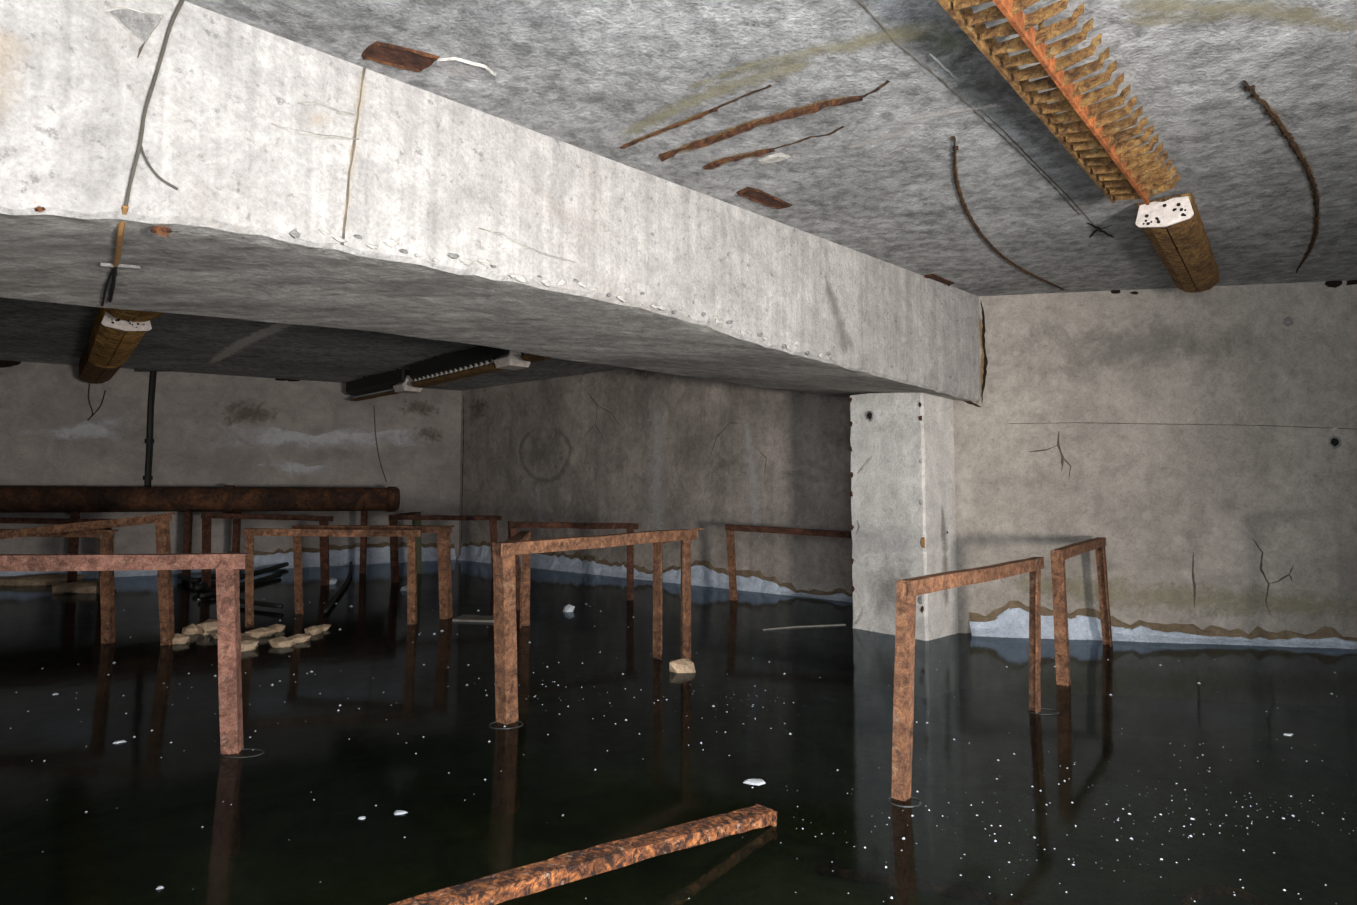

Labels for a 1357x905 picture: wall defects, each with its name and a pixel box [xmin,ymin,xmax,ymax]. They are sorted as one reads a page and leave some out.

crack [341,67,366,245]
rust [150,226,172,237]
damp [519,552,853,602]
damp [969,600,1357,649]